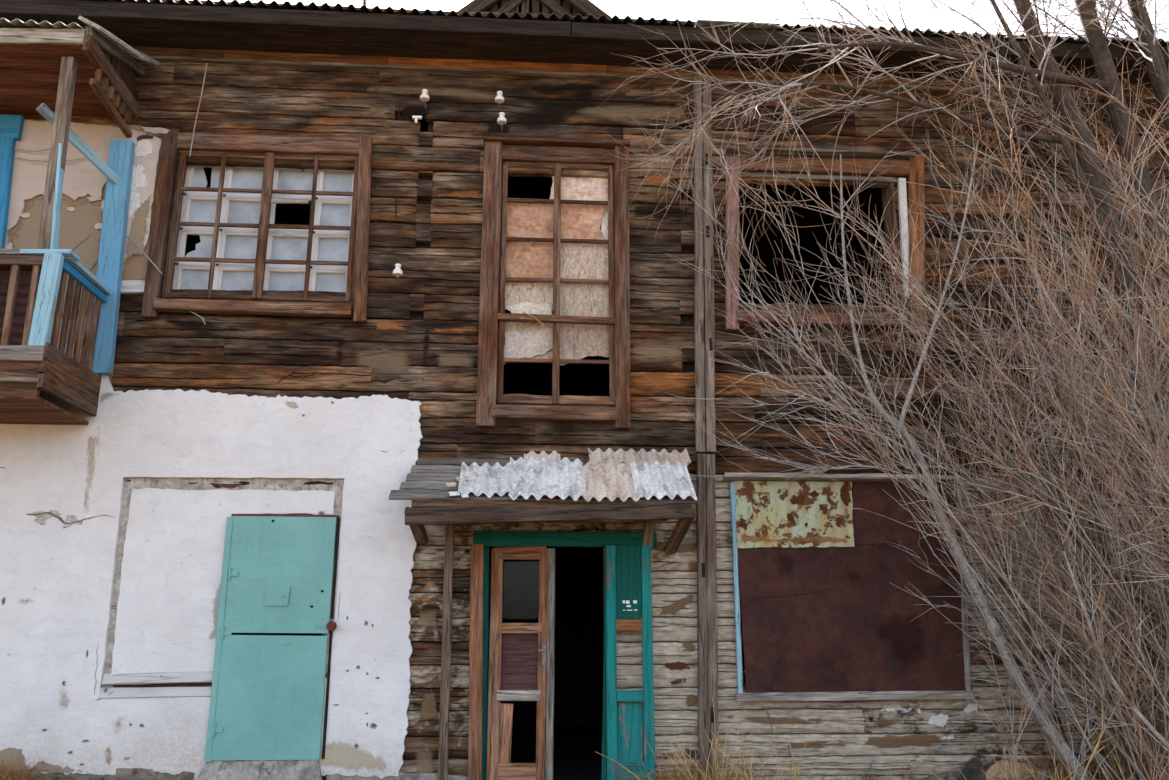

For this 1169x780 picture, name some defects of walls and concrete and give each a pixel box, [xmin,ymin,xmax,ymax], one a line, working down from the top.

peeling [7,198,43,249]
peeling [58,196,104,276]
peeling [125,126,170,261]
crack [26,510,112,528]
rust [738,482,966,693]